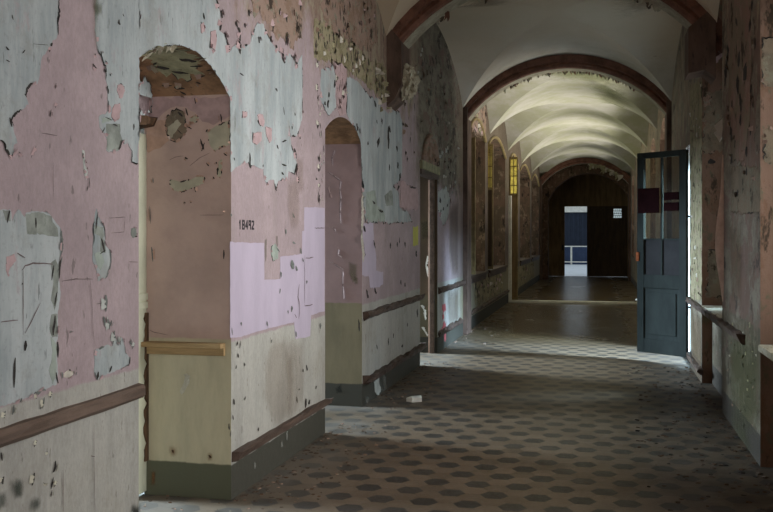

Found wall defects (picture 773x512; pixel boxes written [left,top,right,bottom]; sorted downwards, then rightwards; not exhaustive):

peeling [0,0,61,160]
peeling [93,0,303,204]
peeling [313,0,442,262]
peeling [504,71,635,93]
spalling [0,209,77,418]
peeling [92,209,112,281]
peeling [94,295,135,380]